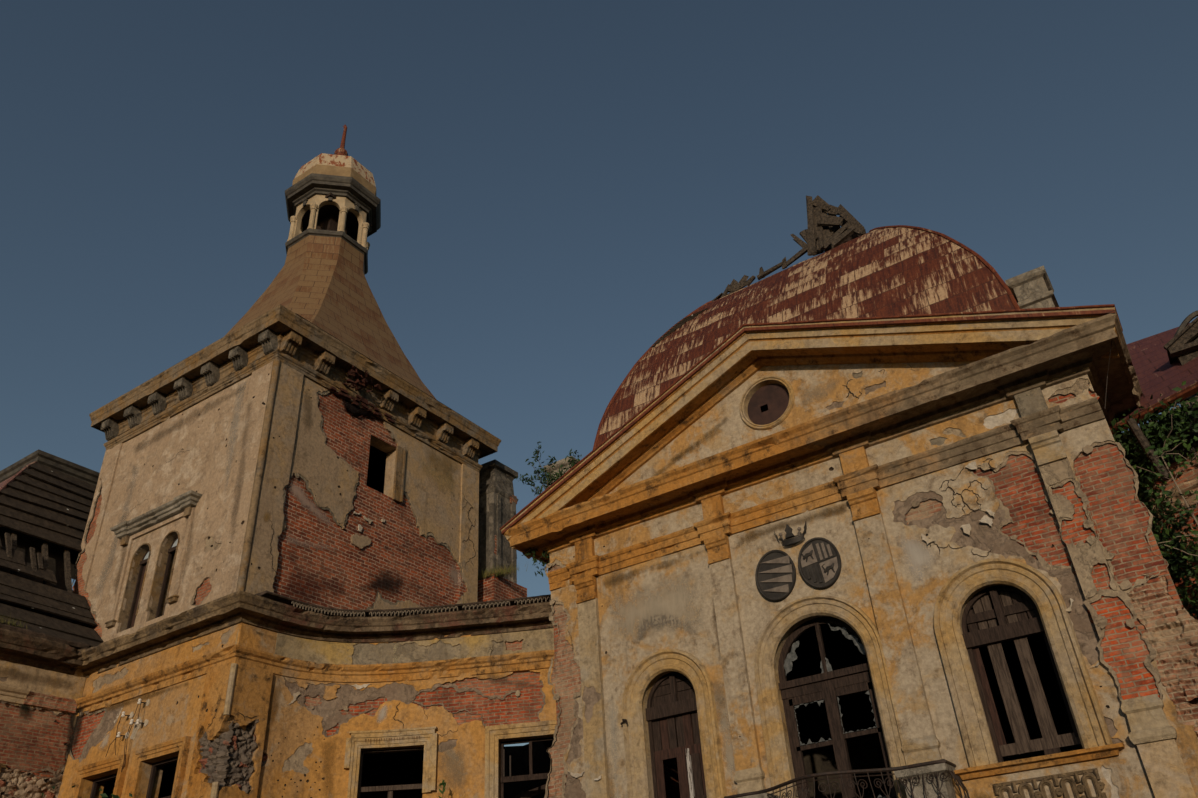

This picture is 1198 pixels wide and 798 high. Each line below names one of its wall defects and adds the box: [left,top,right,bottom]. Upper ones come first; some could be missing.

flaking render [272,386,468,610]
flaking render [960,441,1198,739]
flaking render [0,701,124,798]
spalling [199,695,388,798]
flaking render [410,599,601,798]
peeling [1101,765,1120,798]